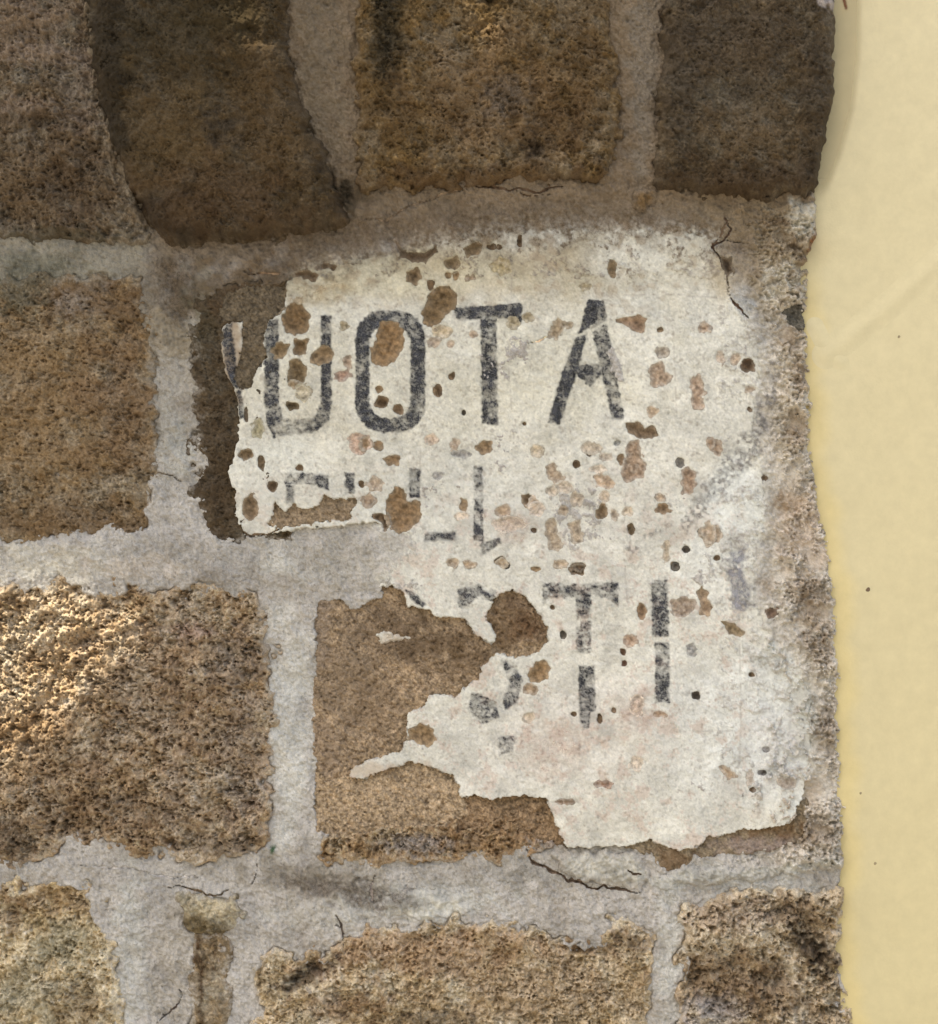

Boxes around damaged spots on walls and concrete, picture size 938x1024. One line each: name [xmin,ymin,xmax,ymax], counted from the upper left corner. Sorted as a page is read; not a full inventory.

crack [711,217,747,317]
spalling [218,269,353,411]
spalling [370,321,405,367]
spalling [374,393,404,415]
peeling [238,417,265,461]
peeling [347,433,400,466]
spalling [242,492,259,521]
spalling [267,475,422,535]
spalling [311,585,576,849]
crack [529,857,642,893]